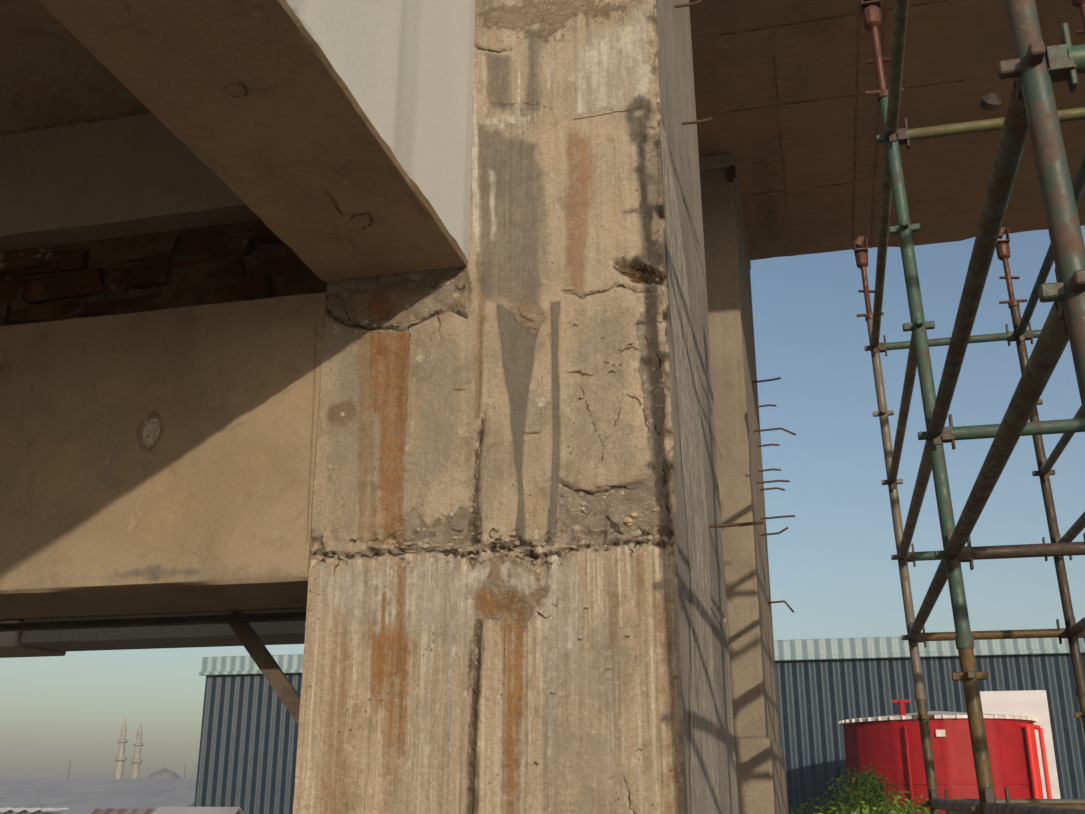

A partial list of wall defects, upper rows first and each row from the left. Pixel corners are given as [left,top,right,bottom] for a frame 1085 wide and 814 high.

corrosion [567,136,592,289]
corrosion [370,331,409,548]
spalling [322,267,471,328]
leakage [468,416,484,541]
leakage [471,32,579,763]
crack [561,346,649,495]
spalling [556,133,672,547]
crack [570,273,678,339]
corrosion [369,564,412,745]
spalling [392,505,559,627]
corrosion [504,590,524,808]
crack [312,527,734,651]